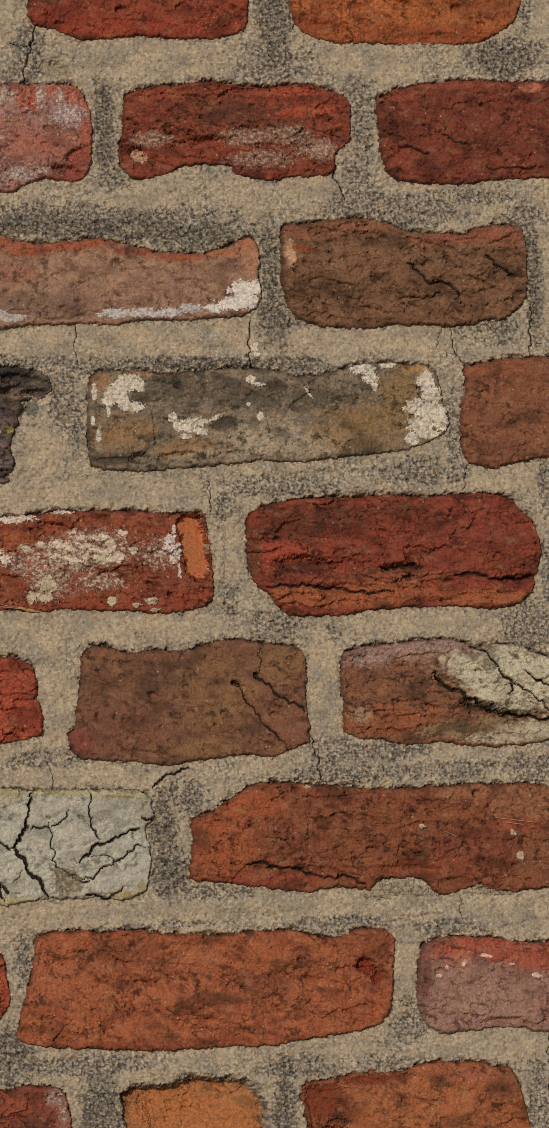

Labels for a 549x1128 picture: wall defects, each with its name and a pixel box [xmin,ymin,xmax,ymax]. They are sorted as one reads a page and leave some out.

water stain [0,510,75,524]
water stain [0,524,185,607]
water stain [132,597,161,613]
crack [433,640,549,721]
crack [0,762,153,902]